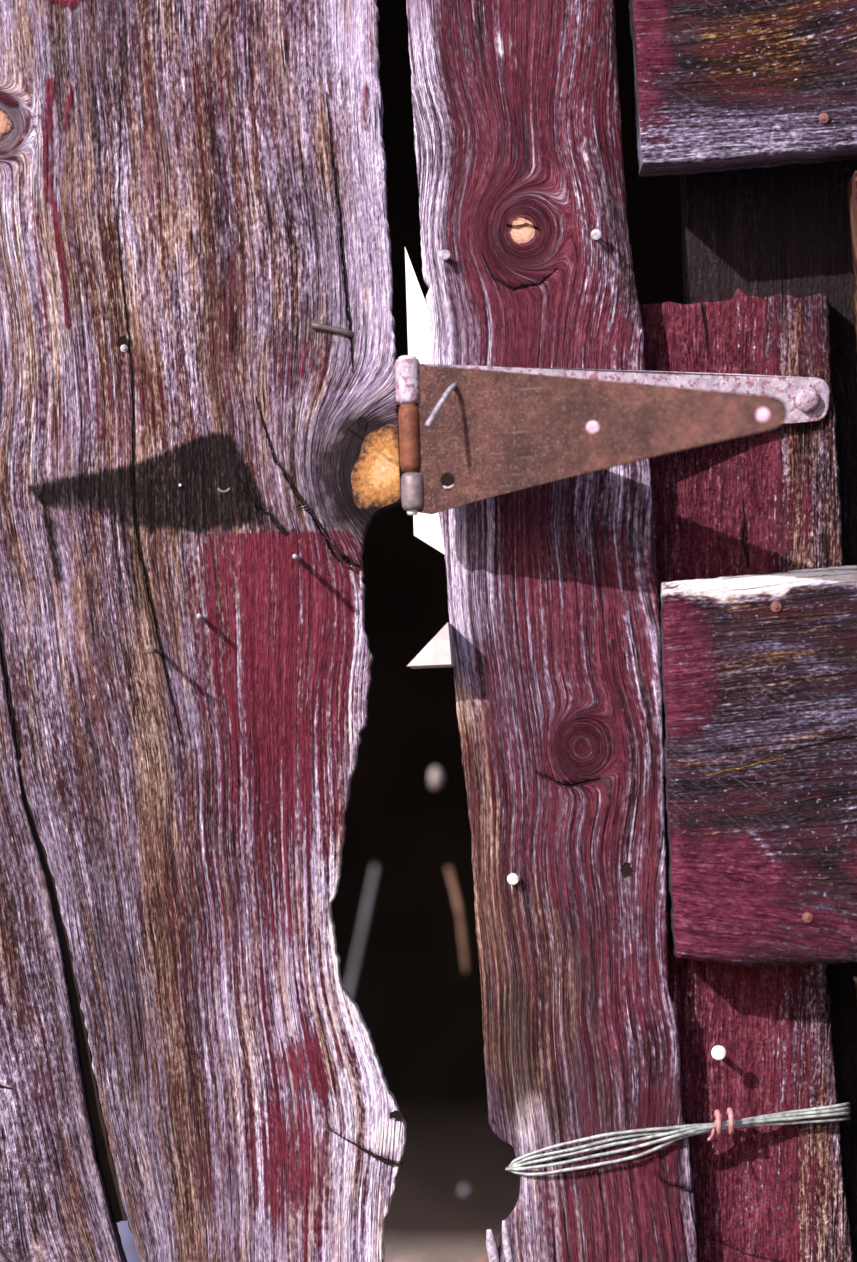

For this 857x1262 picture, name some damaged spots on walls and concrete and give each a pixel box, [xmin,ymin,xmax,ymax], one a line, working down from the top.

crack [240,396,361,573]
crack [706,736,857,776]
crack [536,772,601,788]
crack [0,634,128,1223]
crack [327,1127,403,1167]
crack [705,1235,783,1262]